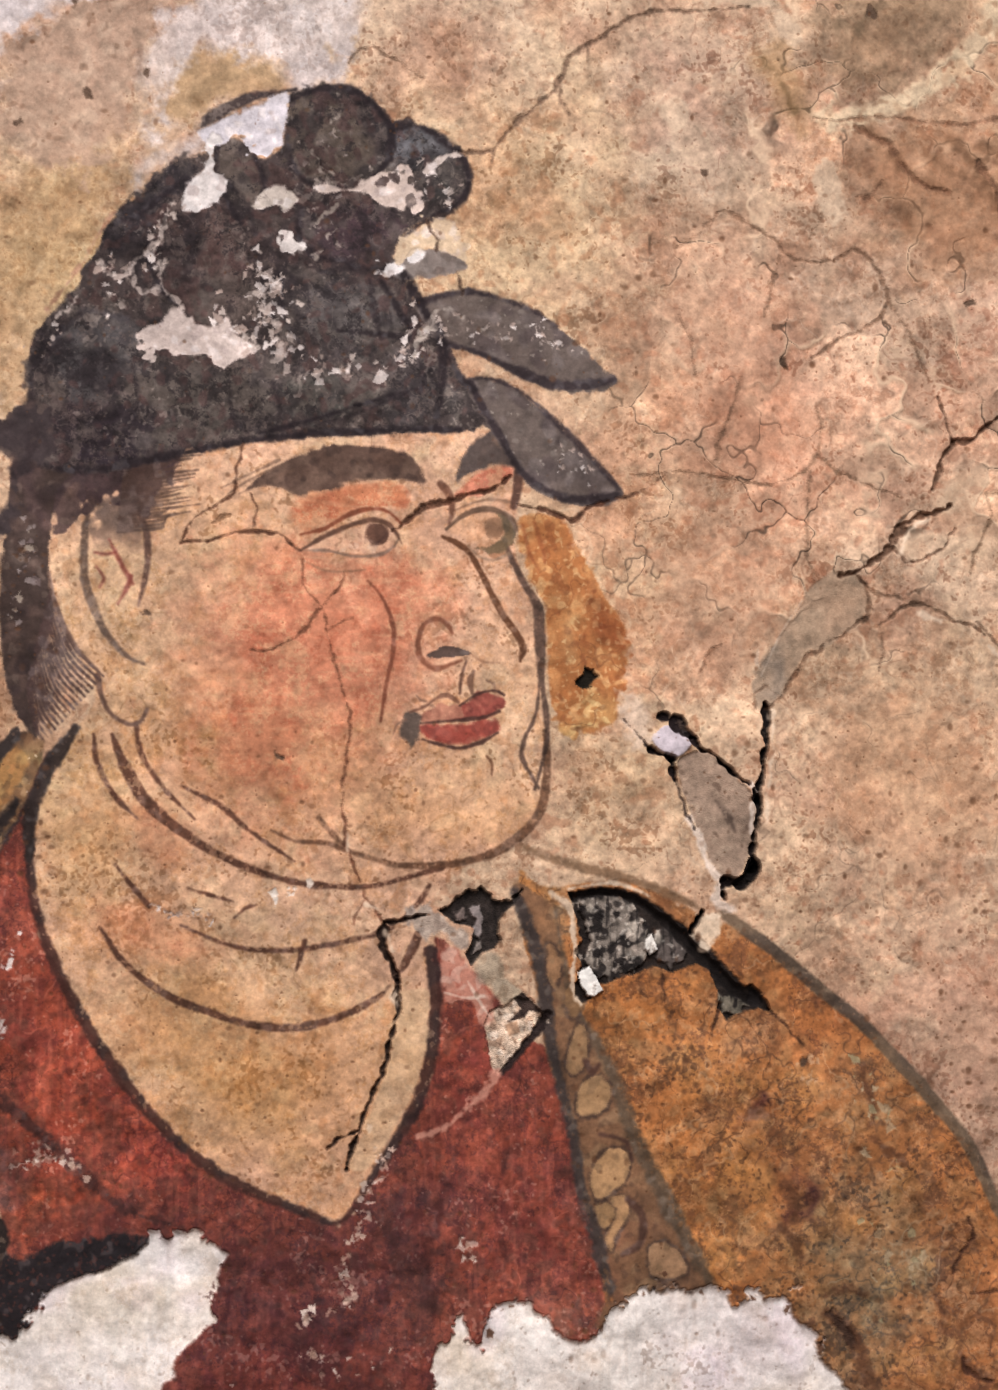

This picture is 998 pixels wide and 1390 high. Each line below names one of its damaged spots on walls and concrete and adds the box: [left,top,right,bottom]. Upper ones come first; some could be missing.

peeling [21,0,576,389]
crack [458,4,751,164]
crack [812,114,998,215]
crack [389,209,998,936]
flaking render [612,684,692,757]
crack [178,441,428,1173]
flaking render [547,812,771,1023]
crack [709,1007,721,1037]
crack [766,1008,807,1047]
peeling [287,885,553,1387]
flaking render [0,1223,233,1390]
flaking render [425,1270,870,1390]